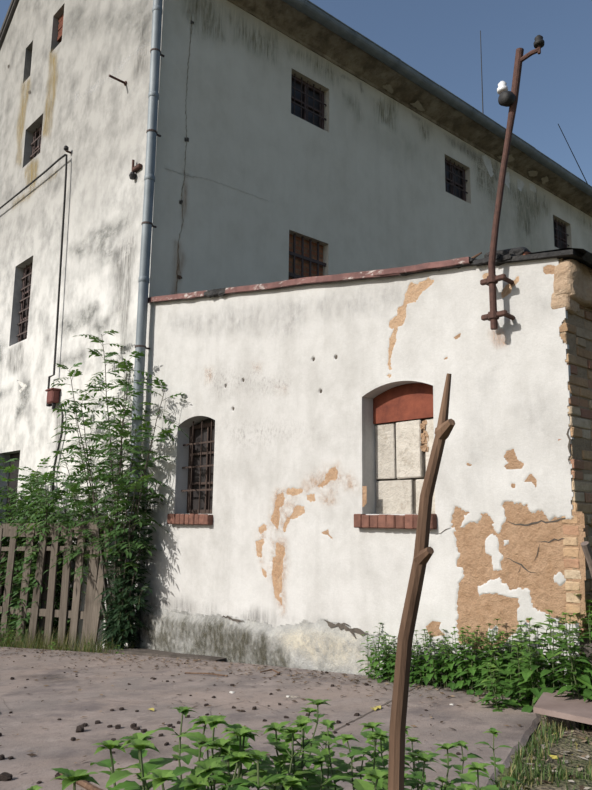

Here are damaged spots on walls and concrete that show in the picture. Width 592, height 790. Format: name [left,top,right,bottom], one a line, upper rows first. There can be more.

crack [165,13,270,294]
flaking render [387,277,434,378]
flaking render [504,449,524,469]
flaking render [255,466,338,605]
flaking render [451,501,592,650]
water stain [138,613,286,667]
flaking render [426,621,445,637]